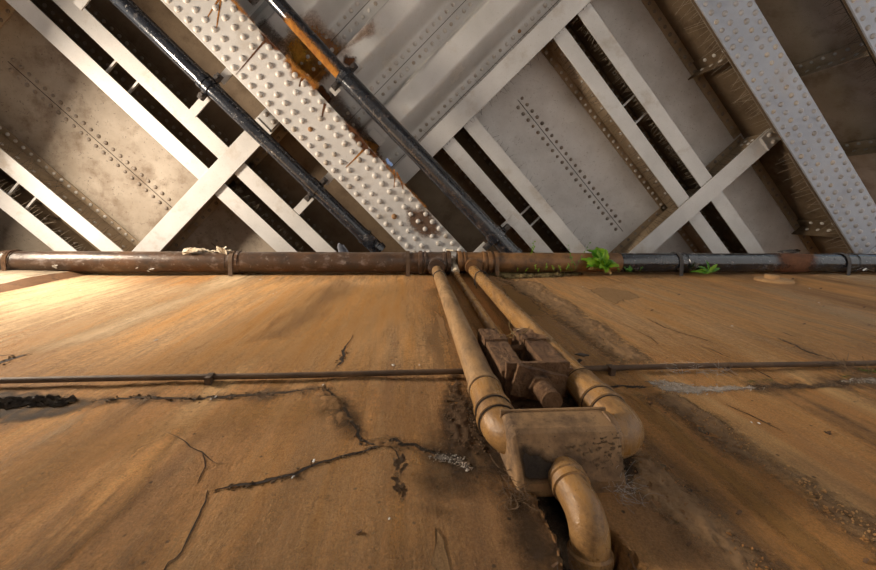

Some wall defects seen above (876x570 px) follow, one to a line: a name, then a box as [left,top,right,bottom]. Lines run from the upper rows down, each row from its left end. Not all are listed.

rust [236,16,426,207]
crack [0,353,31,366]
leakage [0,273,451,423]
crack [92,335,440,570]
leakage [648,379,785,395]